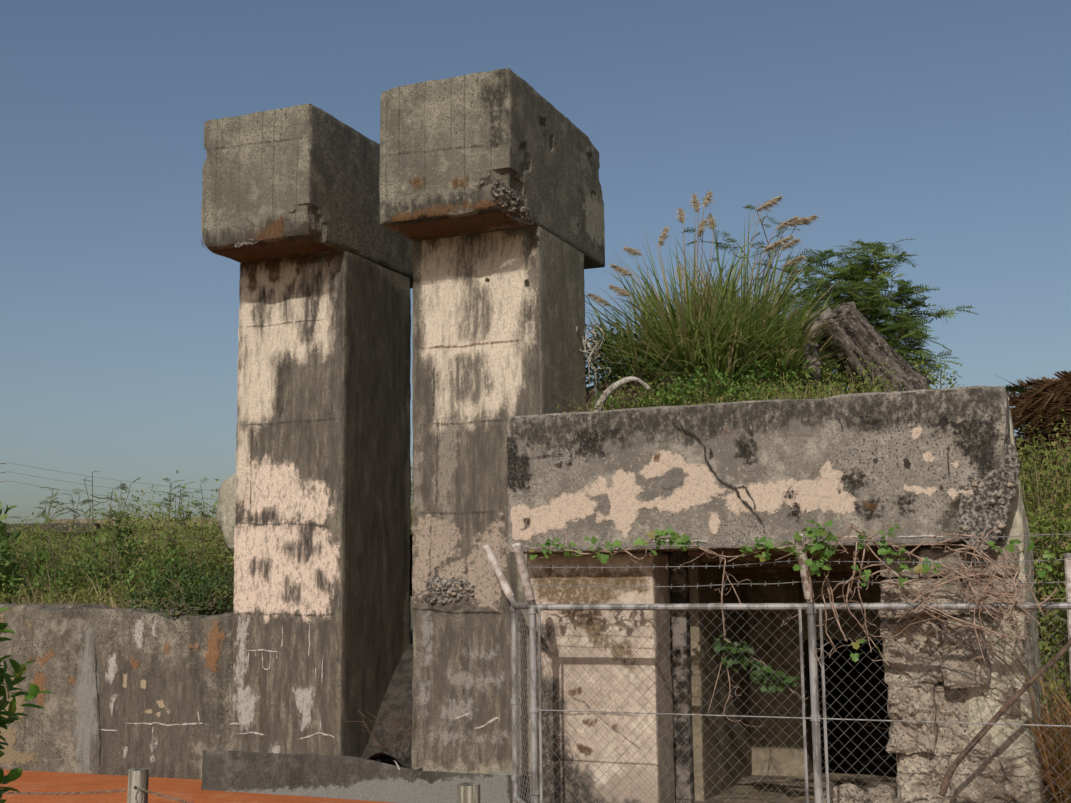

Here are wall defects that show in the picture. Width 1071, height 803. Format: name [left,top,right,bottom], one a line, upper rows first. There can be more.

water stain [202,218,309,247]
corrosion [210,215,343,291]
corrosion [392,199,499,222]
peeling [233,258,340,622]
water stain [228,227,1002,803]
peeling [412,181,861,610]
crack [672,420,765,534]
spalling [904,438,1020,551]
water stain [133,619,158,649]
water stain [74,627,214,779]